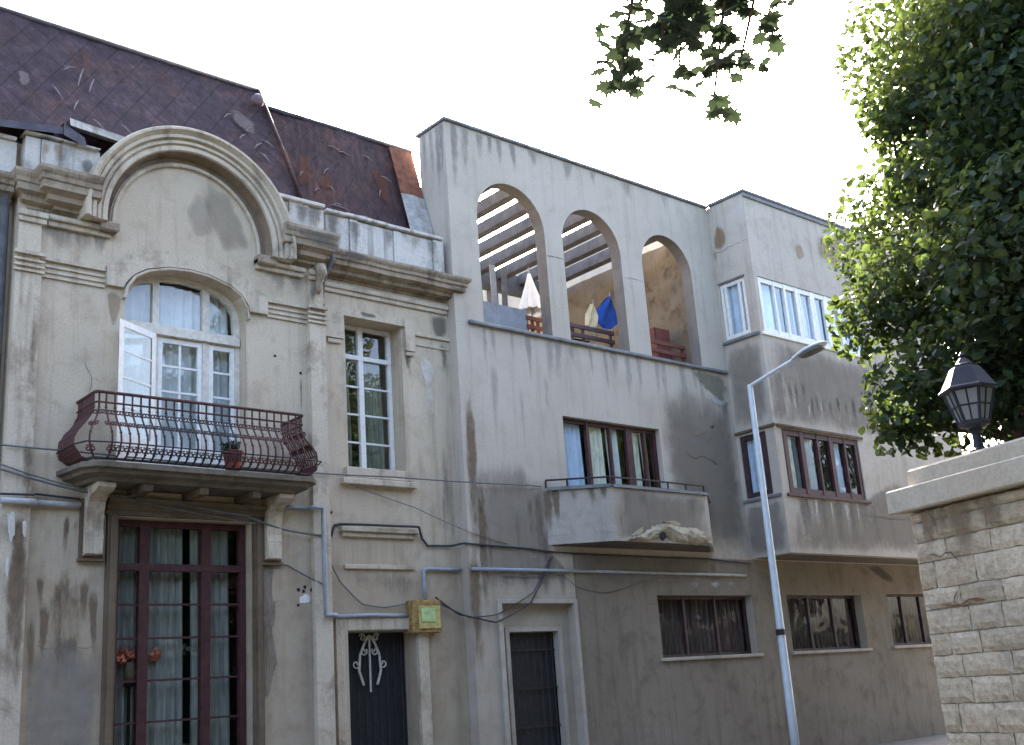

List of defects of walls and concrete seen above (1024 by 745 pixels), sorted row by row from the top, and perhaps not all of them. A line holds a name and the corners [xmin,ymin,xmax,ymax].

peeling [7,511,27,542]
leakage [467,412,486,640]
leakage [541,490,559,522]
leakage [8,523,48,661]
leakage [81,584,97,639]
crack [941,590,985,607]